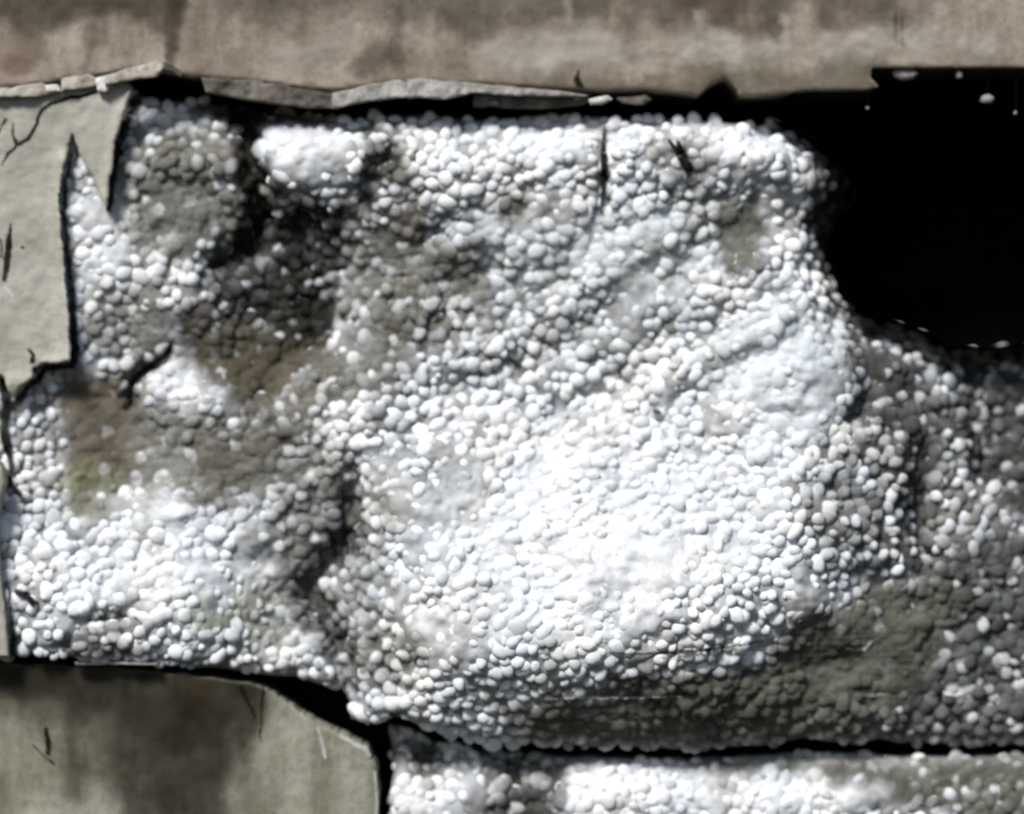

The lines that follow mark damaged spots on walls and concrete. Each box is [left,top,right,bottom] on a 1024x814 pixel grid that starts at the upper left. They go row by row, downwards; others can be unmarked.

crack [0,91,97,165]
spalling [667,139,694,180]
peeling [0,88,132,399]
damp [64,104,488,681]
peeling [0,459,8,526]
peeling [0,547,38,657]